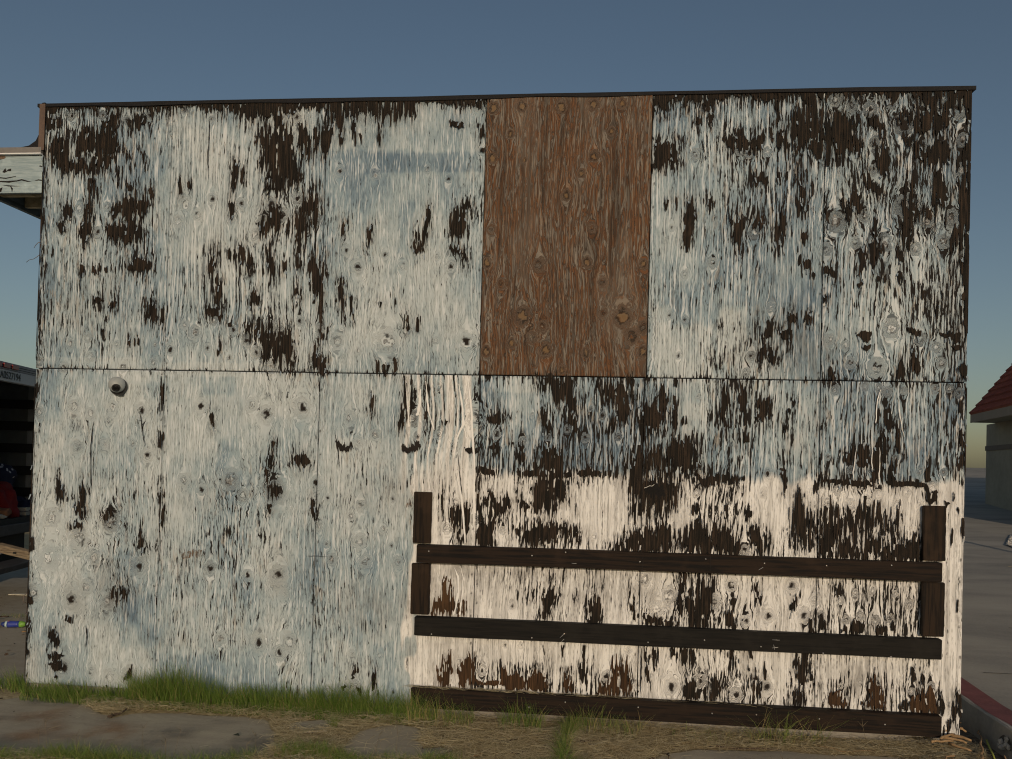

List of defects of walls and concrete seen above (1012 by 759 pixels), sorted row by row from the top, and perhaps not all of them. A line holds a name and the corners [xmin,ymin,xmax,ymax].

peeling [36,99,490,379]
peeling [652,90,972,341]
peeling [56,474,86,533]
peeling [780,403,965,561]
peeling [430,576,467,617]
peeling [628,572,714,628]
peeling [47,614,77,678]
peeling [436,649,549,692]
peeling [561,645,633,697]
peeling [644,646,722,701]
peeling [790,653,813,707]
peeling [828,666,963,731]